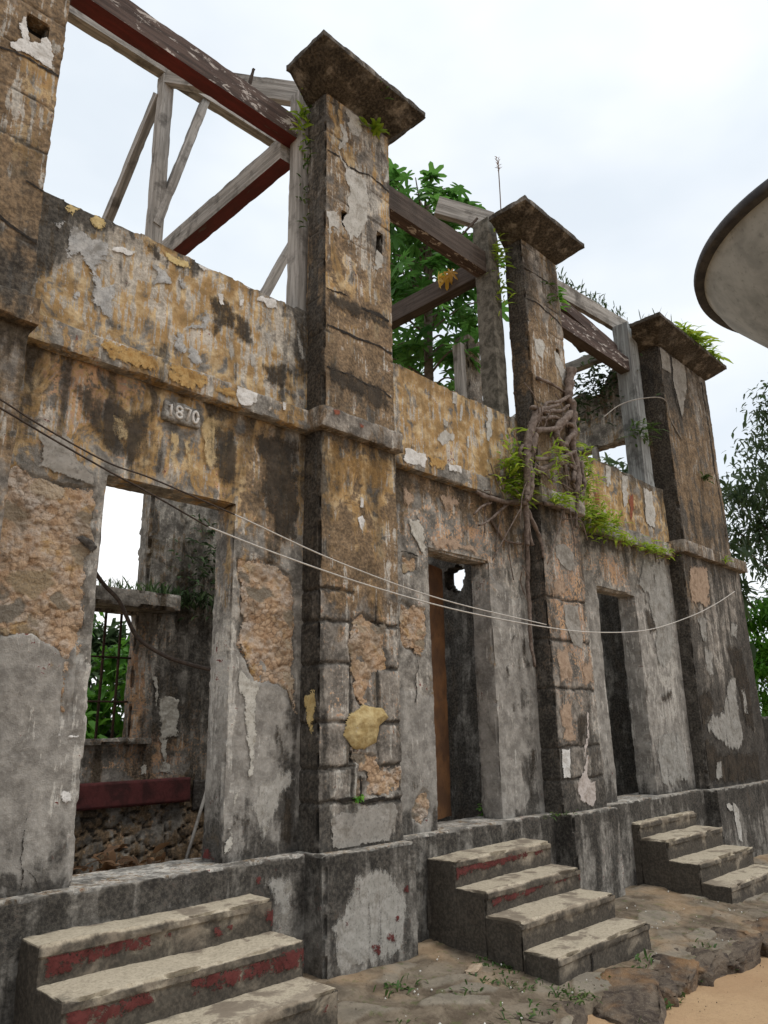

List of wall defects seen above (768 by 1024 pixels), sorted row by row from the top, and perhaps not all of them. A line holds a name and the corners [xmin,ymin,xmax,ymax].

peeling [10,17,54,69]
peeling [56,204,135,320]
leakage [76,384,192,473]
leakage [202,417,237,485]
leakage [210,296,292,387]
leakage [258,434,299,543]
leakage [329,293,389,328]
leakage [330,364,388,410]
spalling [0,466,97,713]
spalling [236,558,316,777]
spalling [347,614,386,705]
peeling [44,935,151,978]